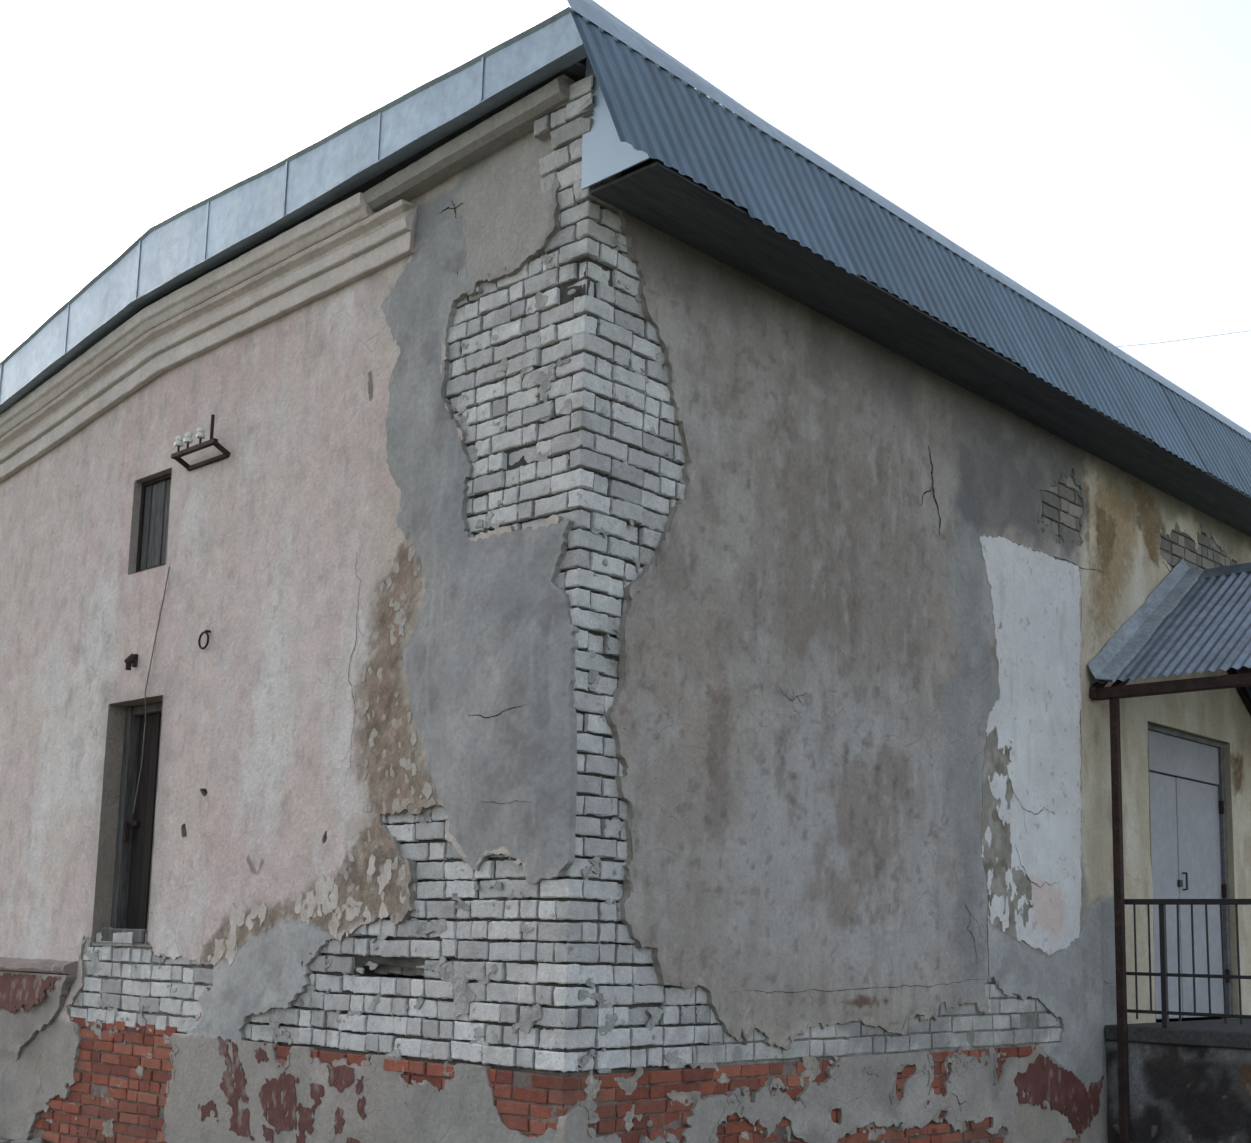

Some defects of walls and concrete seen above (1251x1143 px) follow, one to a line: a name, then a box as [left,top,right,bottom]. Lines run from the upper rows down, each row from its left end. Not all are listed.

crack [921,447,941,533]
leakage [1085,483,1164,624]
flaking render [1159,522,1239,572]
flaking render [30,75,1062,1143]
peeling [979,469,1086,955]
peeling [0,973,60,1015]
peeling [1014,1054,1104,1143]